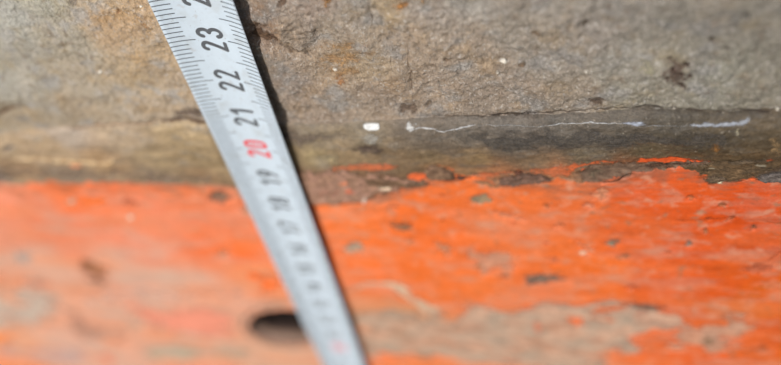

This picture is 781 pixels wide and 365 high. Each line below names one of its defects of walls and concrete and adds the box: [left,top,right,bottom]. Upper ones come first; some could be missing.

spalling [296,157,711,208]
peeling [749,172,781,183]
peeling [342,242,364,253]
peeling [467,250,514,278]
peeling [526,274,564,285]
peeling [346,281,766,365]